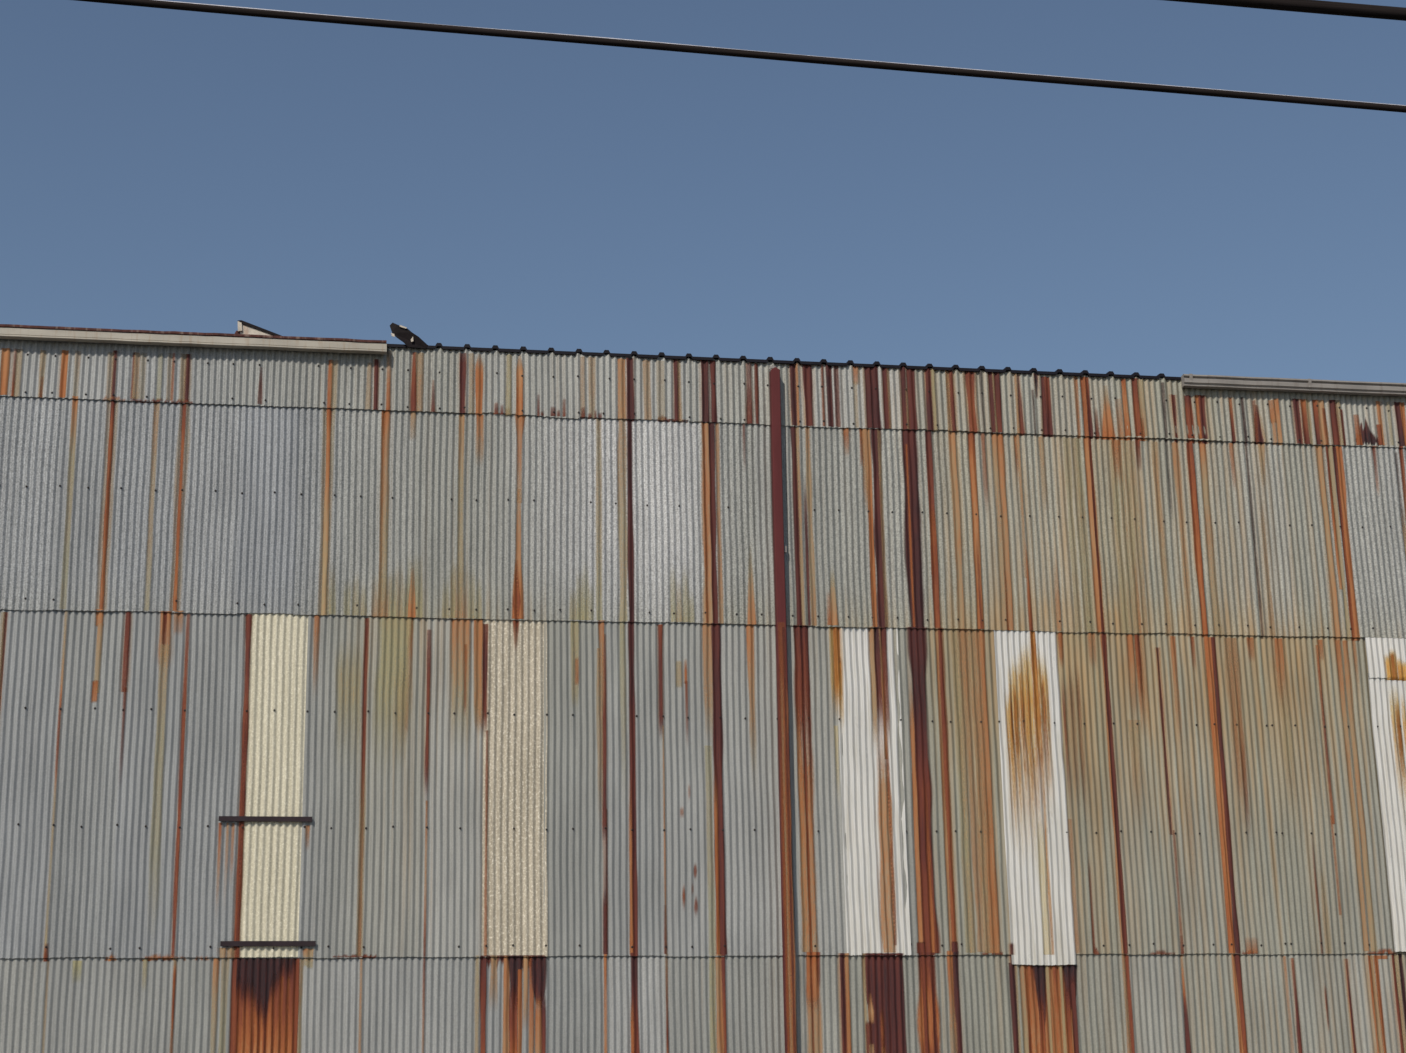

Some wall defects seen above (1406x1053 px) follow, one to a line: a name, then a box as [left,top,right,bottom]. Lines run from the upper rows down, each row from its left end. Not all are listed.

corrosion [92,350,313,1053]
corrosion [452,353,727,1053]
corrosion [779,363,1082,1053]
corrosion [1056,377,1257,1053]
corrosion [1252,398,1406,1053]